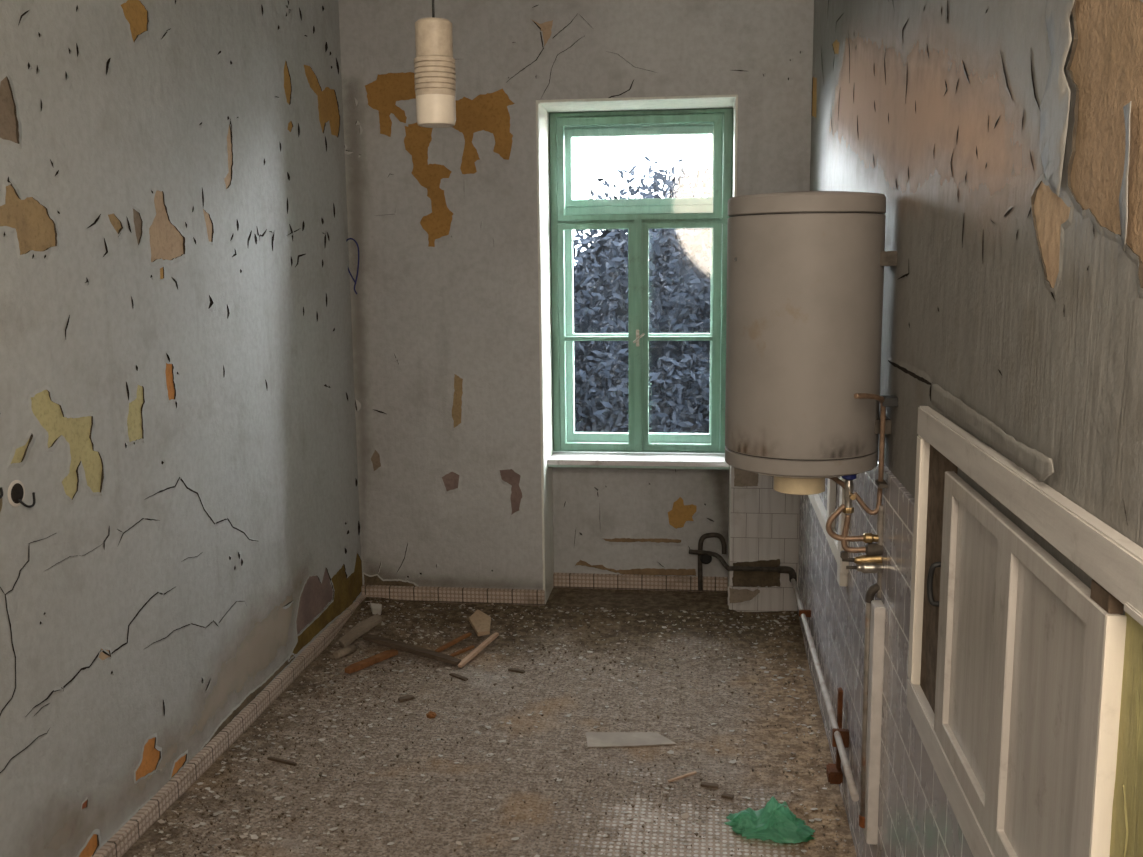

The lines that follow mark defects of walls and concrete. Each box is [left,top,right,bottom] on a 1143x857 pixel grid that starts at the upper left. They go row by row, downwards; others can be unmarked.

peeling [0,72,22,151]
peeling [118,0,171,46]
peeling [274,58,361,158]
peeling [354,70,518,251]
crack [506,14,657,100]
peeling [1027,0,1143,312]
peeling [0,177,60,260]
peeling [87,187,215,289]
peeling [230,198,306,273]
peeling [8,385,106,504]
crack [0,477,259,775]
spalling [133,521,422,785]